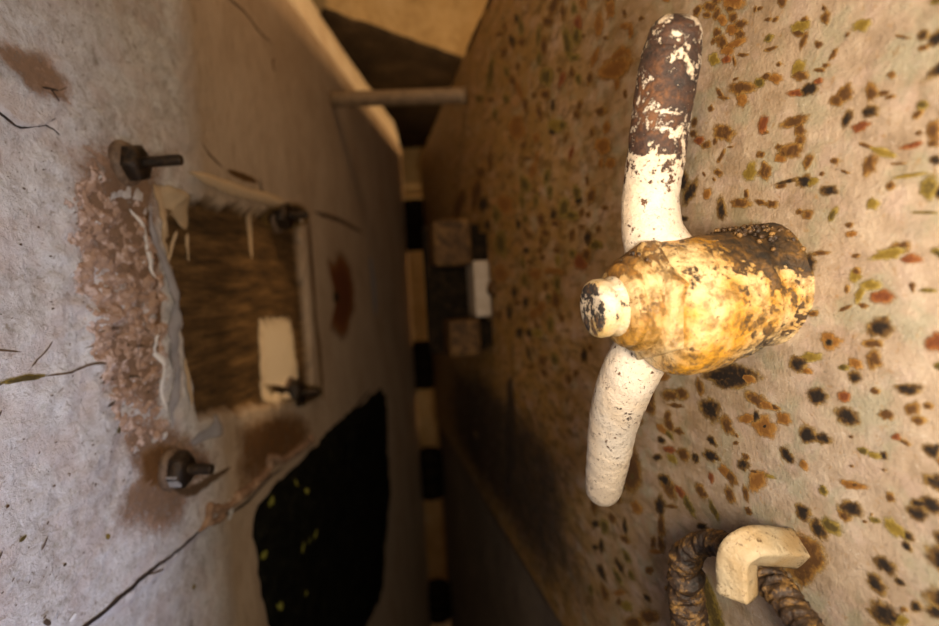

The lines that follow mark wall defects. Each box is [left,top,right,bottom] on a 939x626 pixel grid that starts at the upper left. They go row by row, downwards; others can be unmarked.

leakage [0,44,71,104]
corrosion [693,0,839,112]
crack [0,112,60,135]
corrosion [690,117,737,200]
corrosion [796,208,814,220]
leakage [893,172,939,214]
leakage [868,247,905,261]
flaking render [64,145,191,453]
leakage [849,271,882,305]
leakage [869,516,907,540]
crack [83,531,199,626]
corrosion [784,531,829,590]